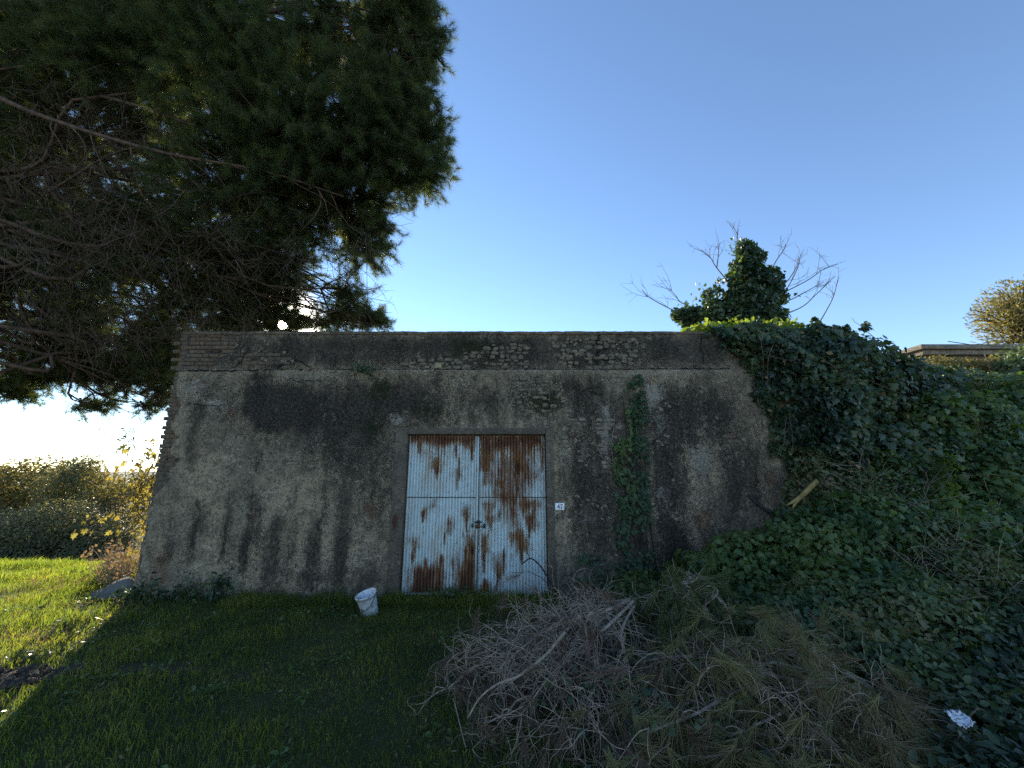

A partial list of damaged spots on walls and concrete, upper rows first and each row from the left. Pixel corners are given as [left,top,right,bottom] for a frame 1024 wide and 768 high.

damp [182,338,760,592]
corrosion [407,436,544,593]